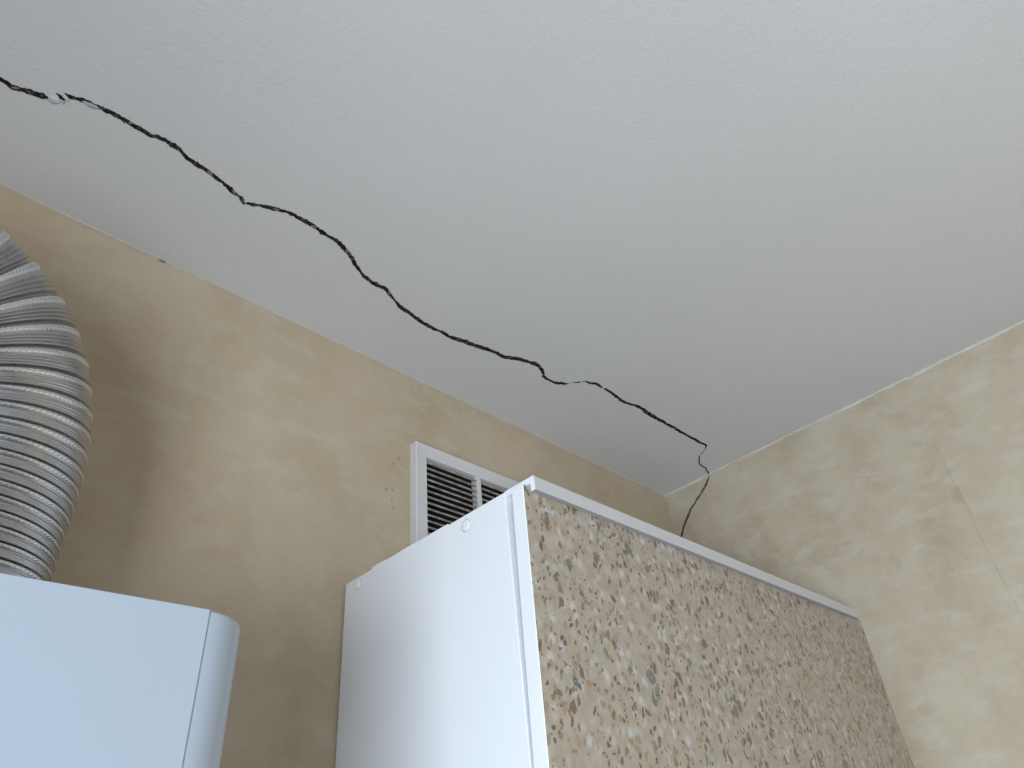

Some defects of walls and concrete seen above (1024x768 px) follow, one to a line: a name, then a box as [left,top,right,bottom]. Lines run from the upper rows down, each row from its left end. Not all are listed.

crack [0,77,709,537]